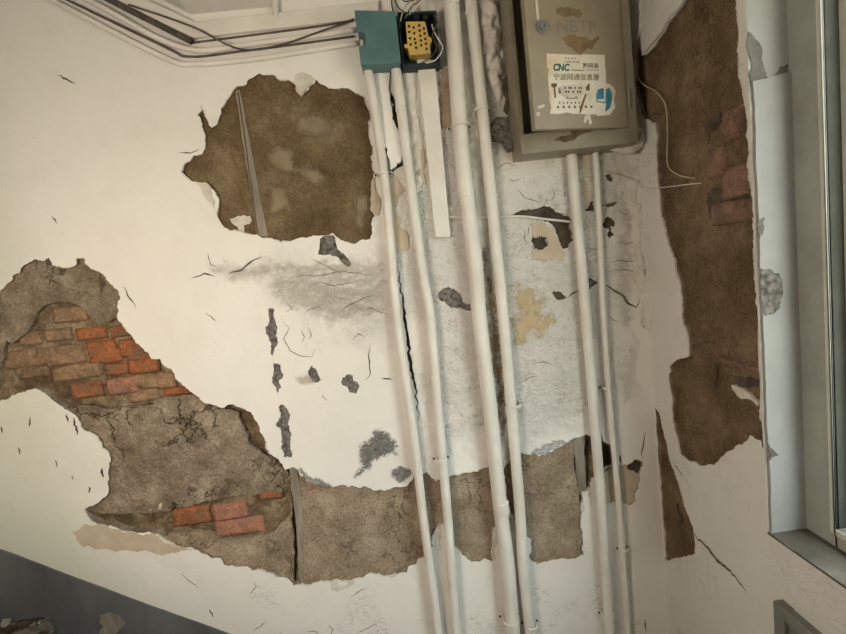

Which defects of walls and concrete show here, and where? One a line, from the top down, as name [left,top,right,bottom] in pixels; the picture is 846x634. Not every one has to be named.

crack [193,255,261,278]
flaking render [180,72,409,267]
crack [281,260,420,421]
damp [510,284,555,344]
peeling [513,207,572,261]
spalling [629,0,789,466]
spalling [0,258,498,592]
spalling [504,462,515,530]
spalling [521,434,593,565]
flaking render [601,440,643,504]
flaking render [658,412,696,561]
crack [694,534,745,590]